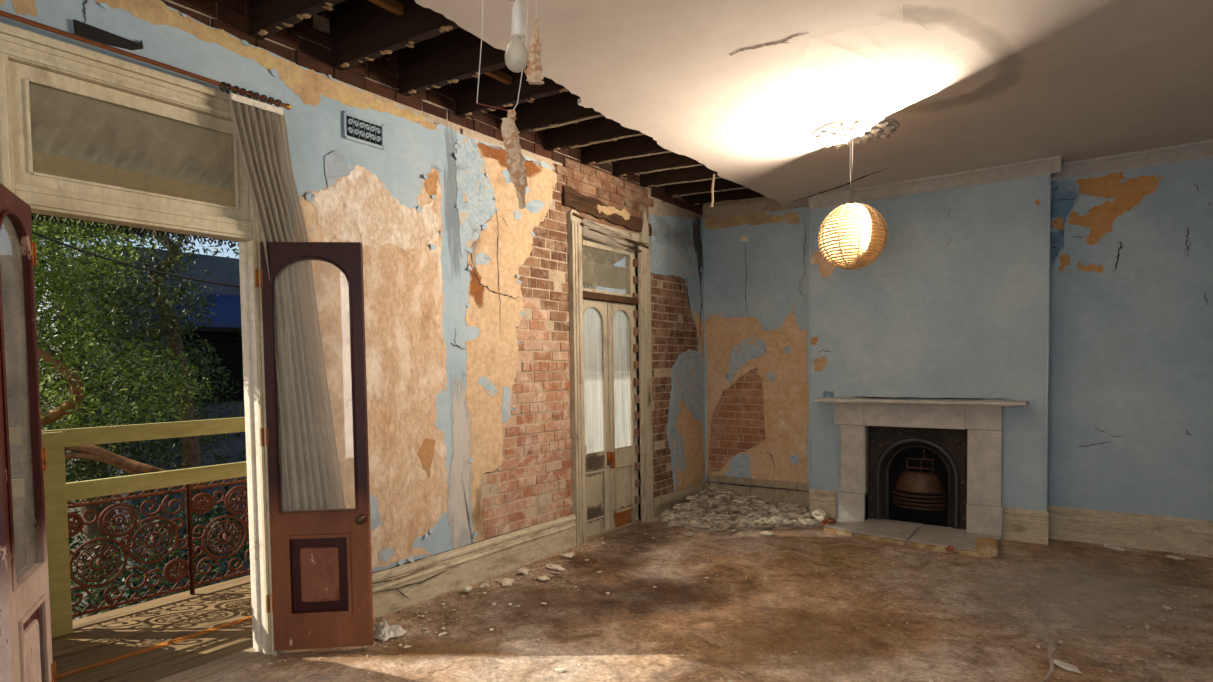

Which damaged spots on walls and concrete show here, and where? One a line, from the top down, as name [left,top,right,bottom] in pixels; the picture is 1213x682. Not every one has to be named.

flaking render [0,0,37,17]
crack [730,33,808,56]
peeling [1034,172,1166,276]
peeling [94,0,827,569]